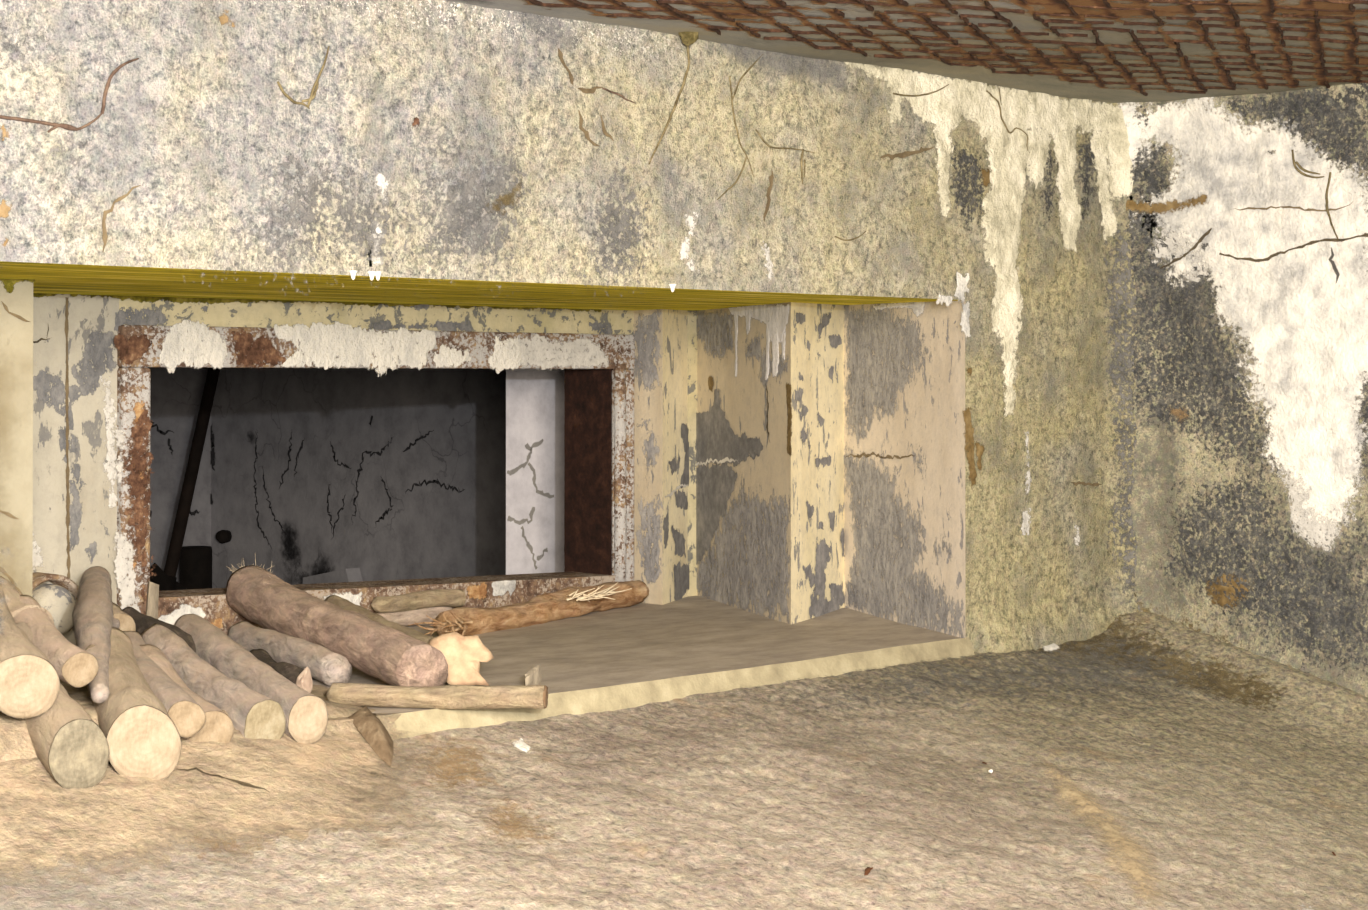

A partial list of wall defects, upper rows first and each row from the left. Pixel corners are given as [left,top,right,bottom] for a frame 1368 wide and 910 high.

crack [558,48,614,146]
crack [763,168,774,221]
crack [1160,204,1368,283]
corrosion [114,333,152,365]
water stain [724,43,1368,678]
peeling [33,331,116,564]
corrosion [123,400,155,614]
crack [150,421,174,454]
crack [189,425,215,516]
crack [253,416,465,549]
crack [507,439,554,569]
peeling [633,303,965,638]